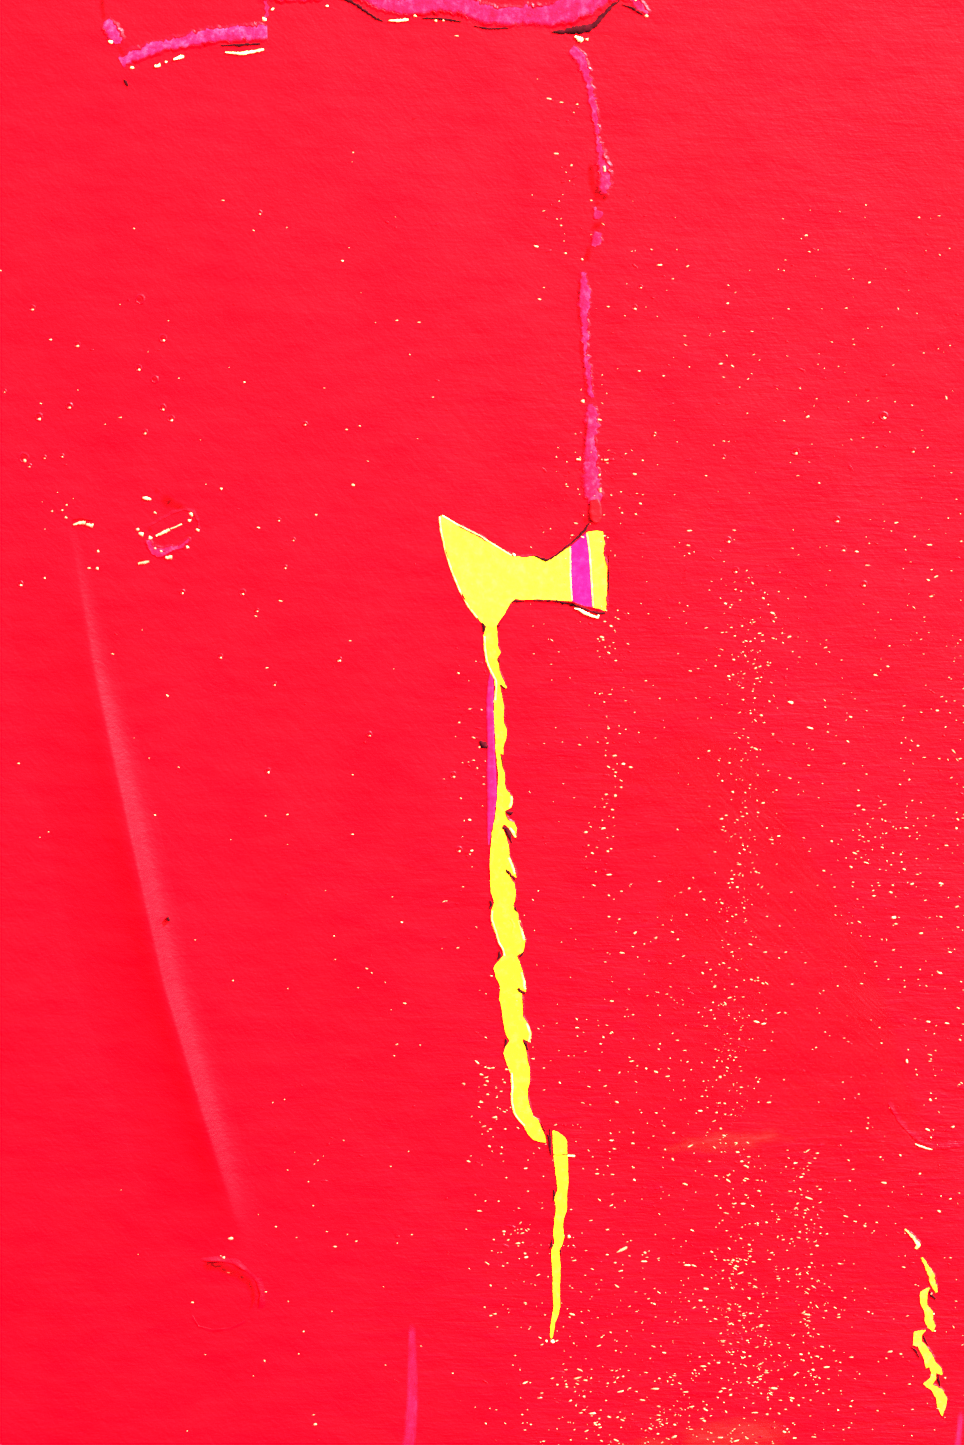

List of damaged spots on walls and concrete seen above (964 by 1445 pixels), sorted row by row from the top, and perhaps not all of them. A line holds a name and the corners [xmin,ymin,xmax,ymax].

crack [100,0,652,522]
peeling [439,514,610,1343]